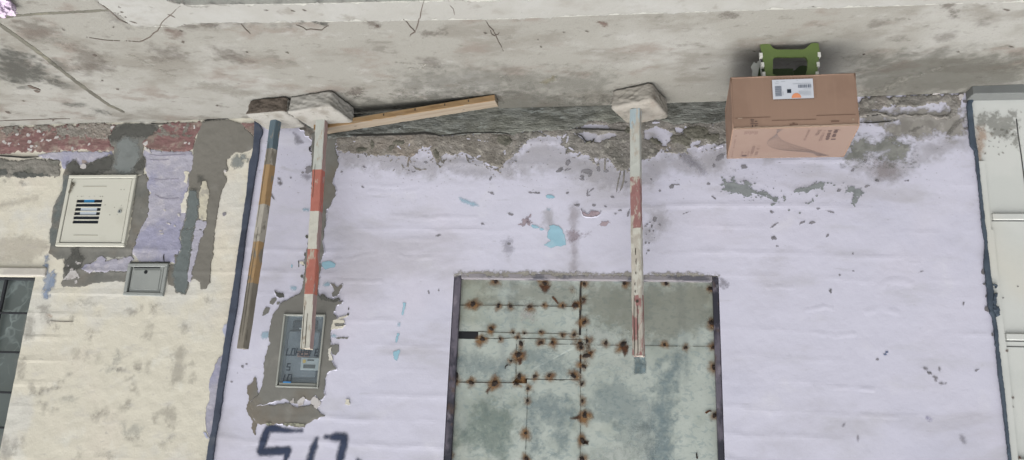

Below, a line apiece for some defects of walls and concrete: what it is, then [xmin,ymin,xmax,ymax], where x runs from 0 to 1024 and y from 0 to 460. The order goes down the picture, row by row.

crack [89,2,180,42]
crack [403,2,424,36]
peeling [858,93,967,120]
peeling [0,130,61,179]
peeling [232,154,248,167]
peeling [335,120,879,247]
peeling [262,290,284,316]
peeling [319,283,343,302]
rust [528,280,628,386]
rust [476,325,555,403]
rust [572,399,592,460]